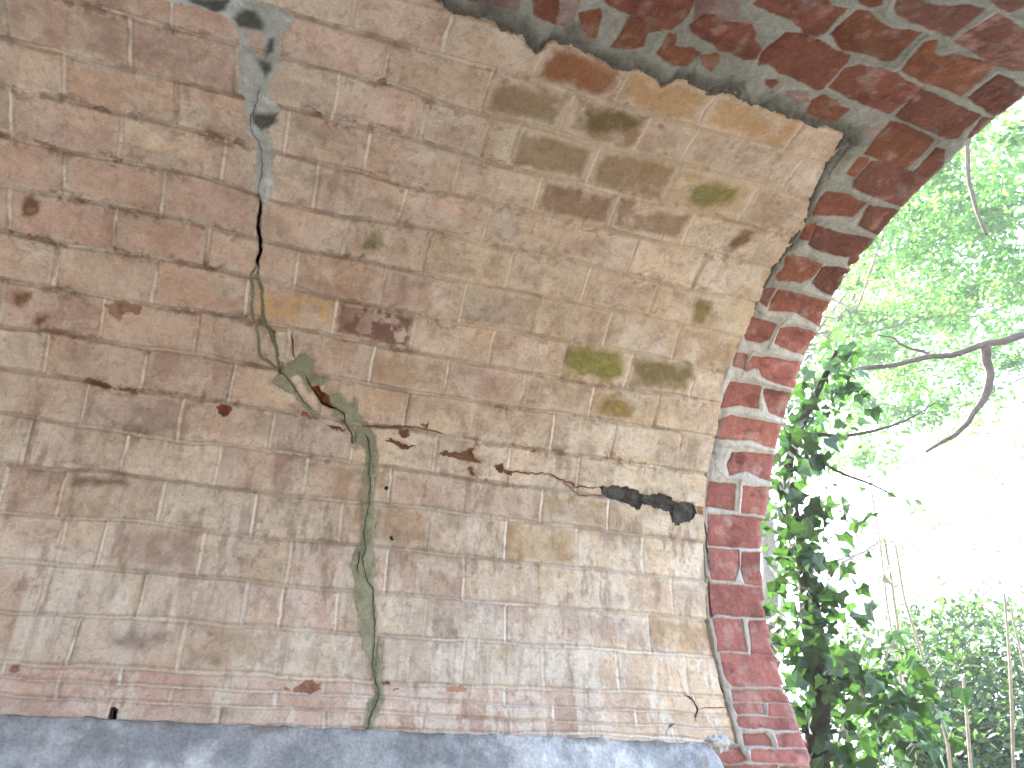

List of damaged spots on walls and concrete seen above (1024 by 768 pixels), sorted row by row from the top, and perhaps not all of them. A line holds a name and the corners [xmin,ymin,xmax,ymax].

water stain [189,0,229,12]
water stain [236,11,261,30]
water stain [261,39,273,75]
water stain [255,114,276,129]
crack [248,90,443,730]
peeling [385,427,416,449]
crack [494,465,606,497]
peeling [600,485,697,526]